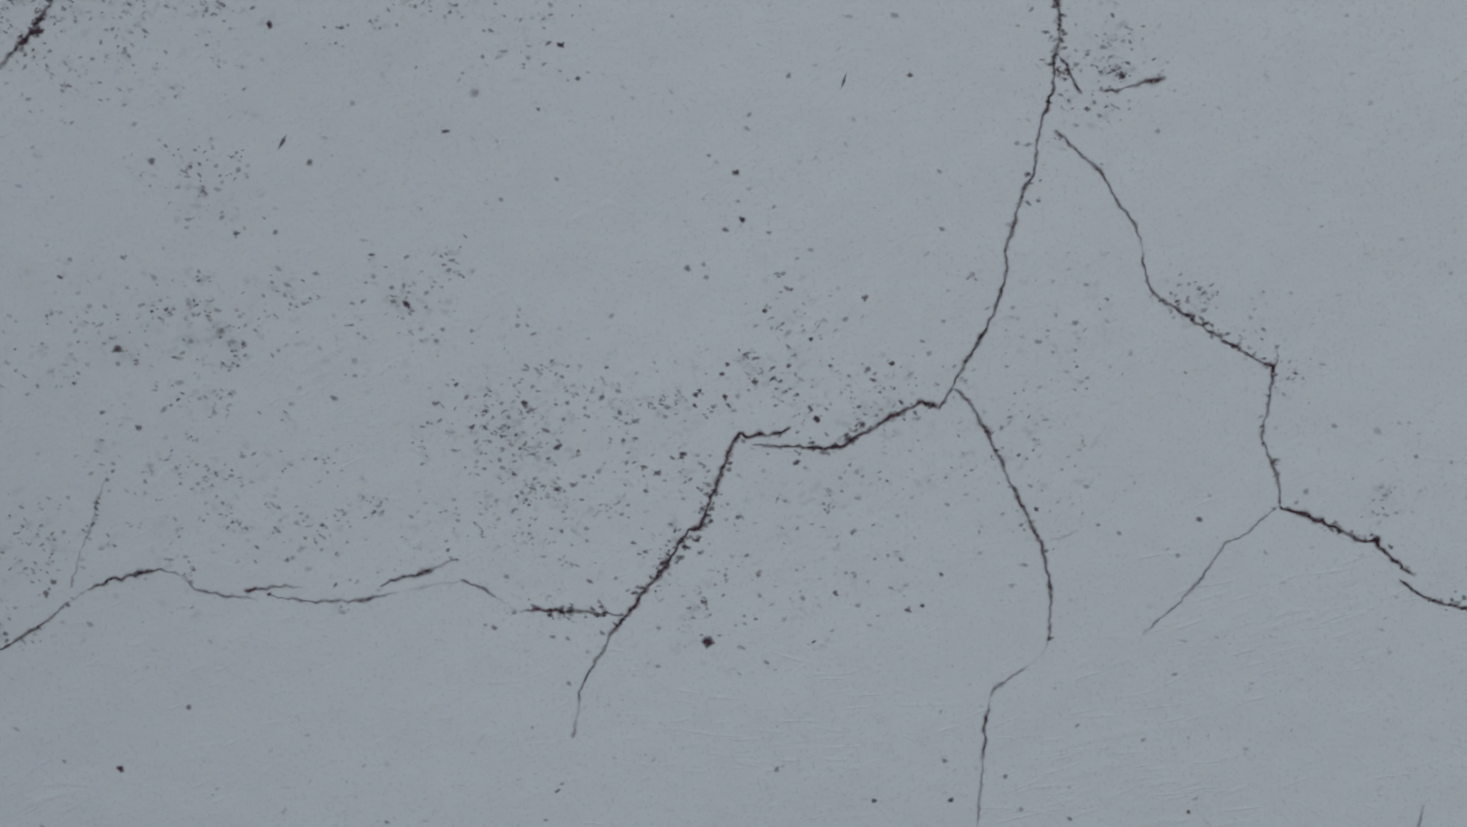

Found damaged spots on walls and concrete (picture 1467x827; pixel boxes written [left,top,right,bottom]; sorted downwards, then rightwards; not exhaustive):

crack [0,0,57,74]
crack [530,0,1467,732]
crack [95,569,162,586]
crack [359,559,487,602]
crack [0,623,44,650]